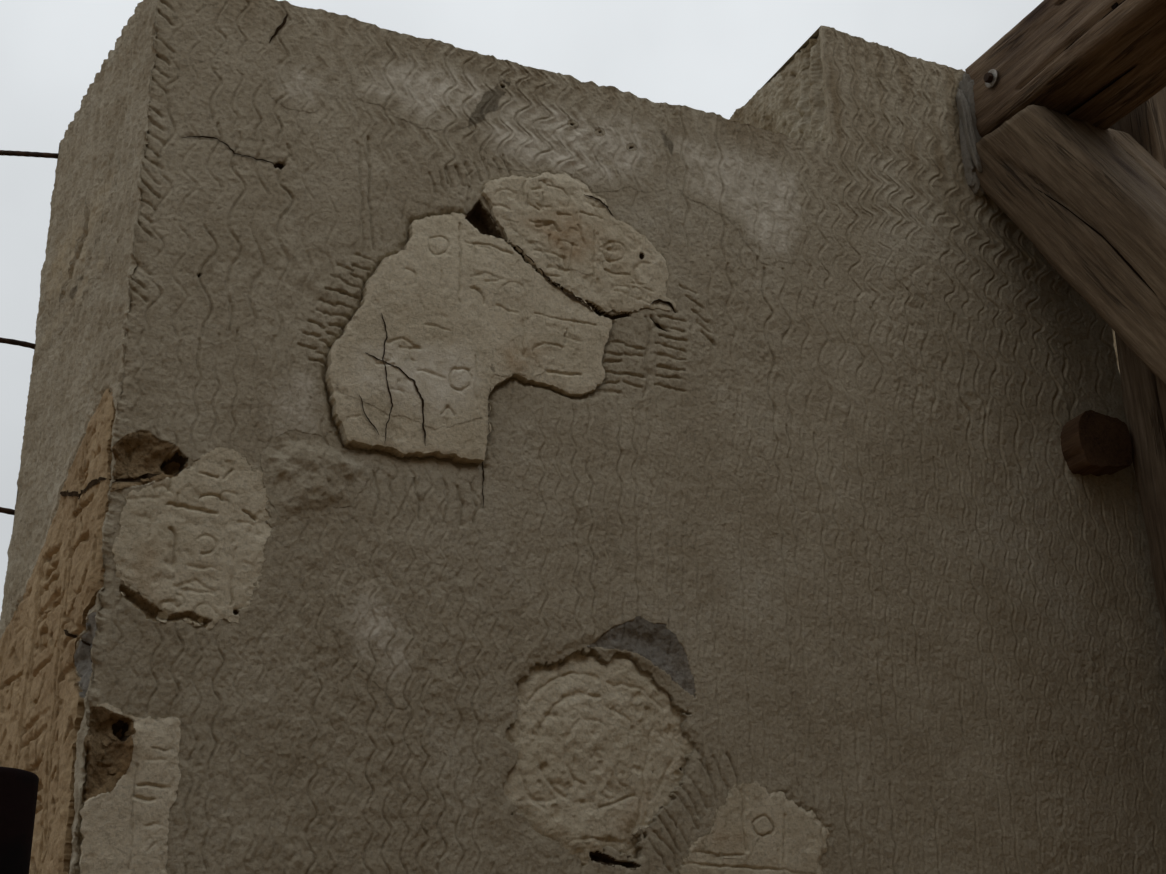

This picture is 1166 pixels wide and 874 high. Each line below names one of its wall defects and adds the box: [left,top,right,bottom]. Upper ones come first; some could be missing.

crack [182,136,276,168]
crack [60,473,161,499]
spalling [110,431,188,492]
spalling [81,706,136,804]